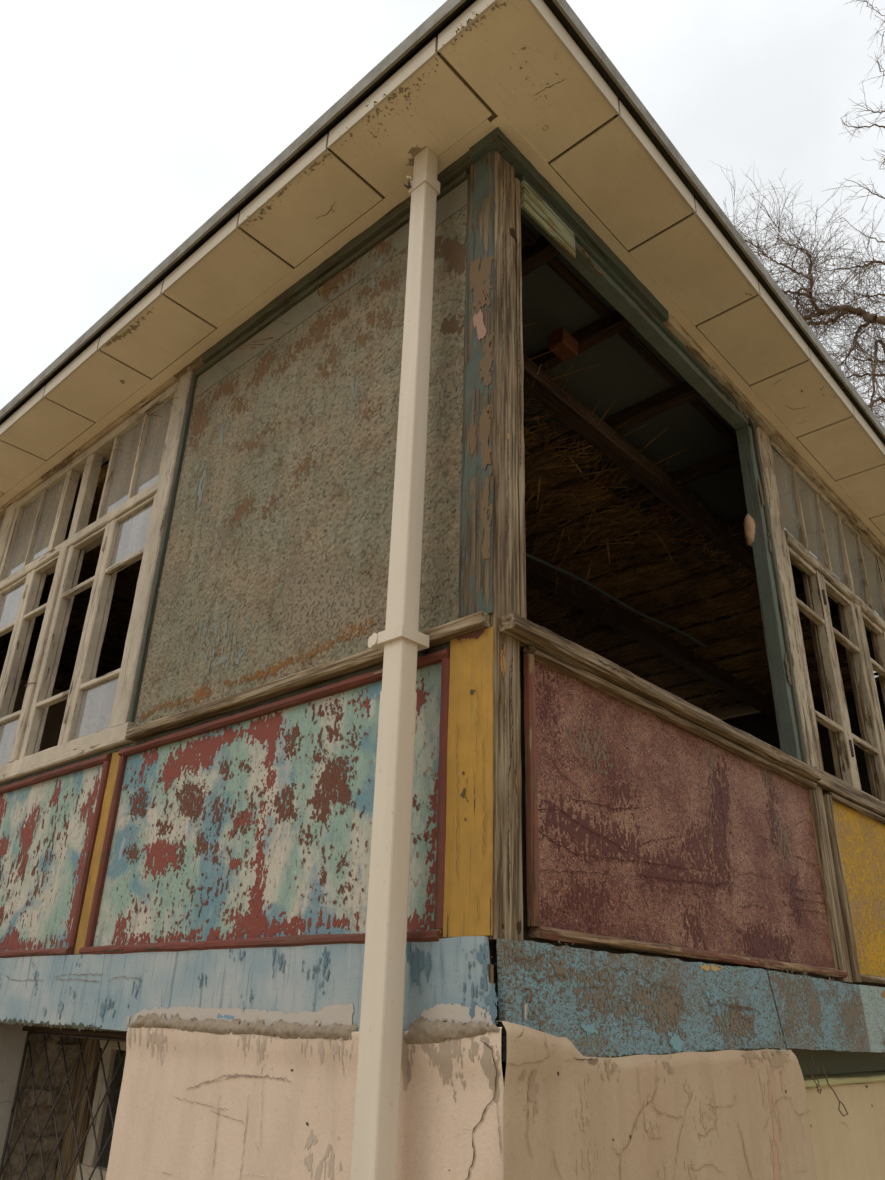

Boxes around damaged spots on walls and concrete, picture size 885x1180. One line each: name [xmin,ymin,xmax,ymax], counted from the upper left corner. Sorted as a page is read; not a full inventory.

peeling [155,559,189,624]
peeling [416,676,430,720]
peeling [111,688,374,945]
peeling [407,767,439,931]
peeling [495,750,863,1064]
crack [465,1029,597,1180]
crack [511,951,810,1180]